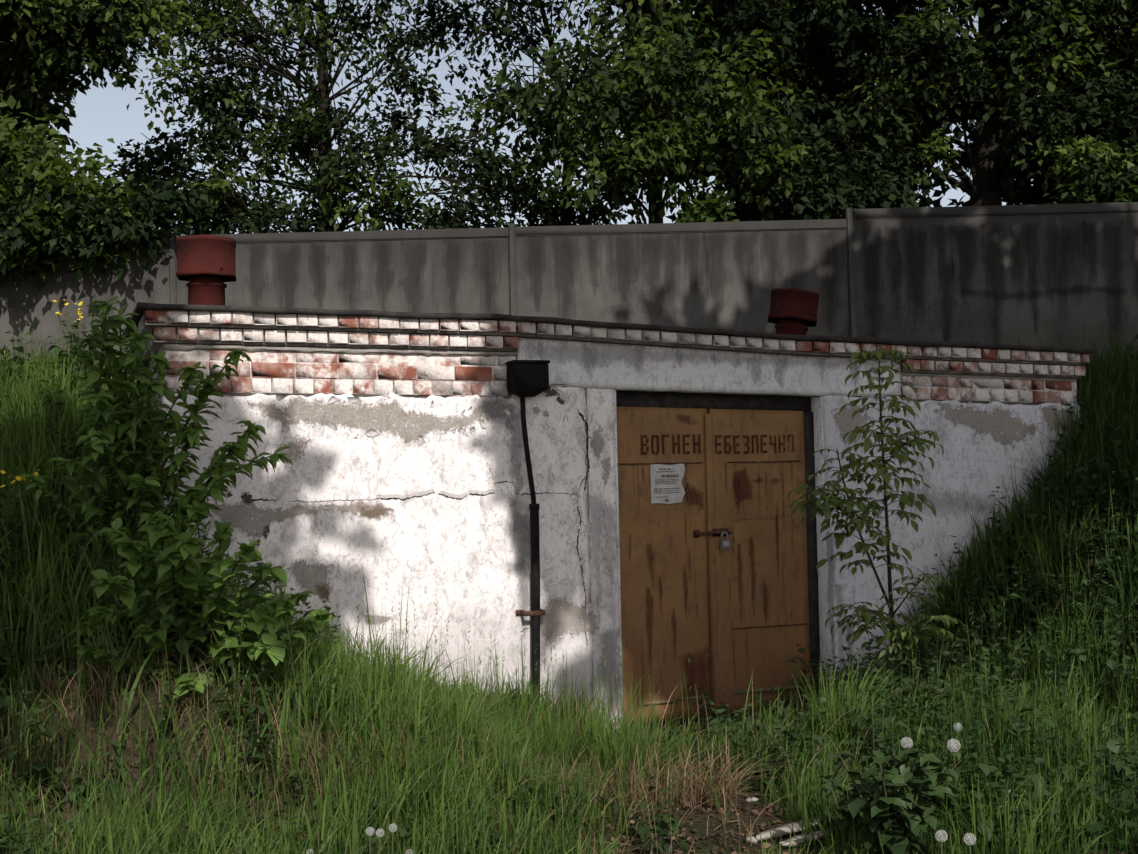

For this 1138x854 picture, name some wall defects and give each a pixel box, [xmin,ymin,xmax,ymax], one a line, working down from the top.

flaking render [533,385,564,416]
peeling [248,393,518,463]
peeling [924,401,1082,445]
rust [733,470,751,509]
peeling [208,491,394,546]
crack [252,384,591,646]
peeling [282,559,335,601]
peeling [365,614,390,625]
peeling [522,597,600,645]